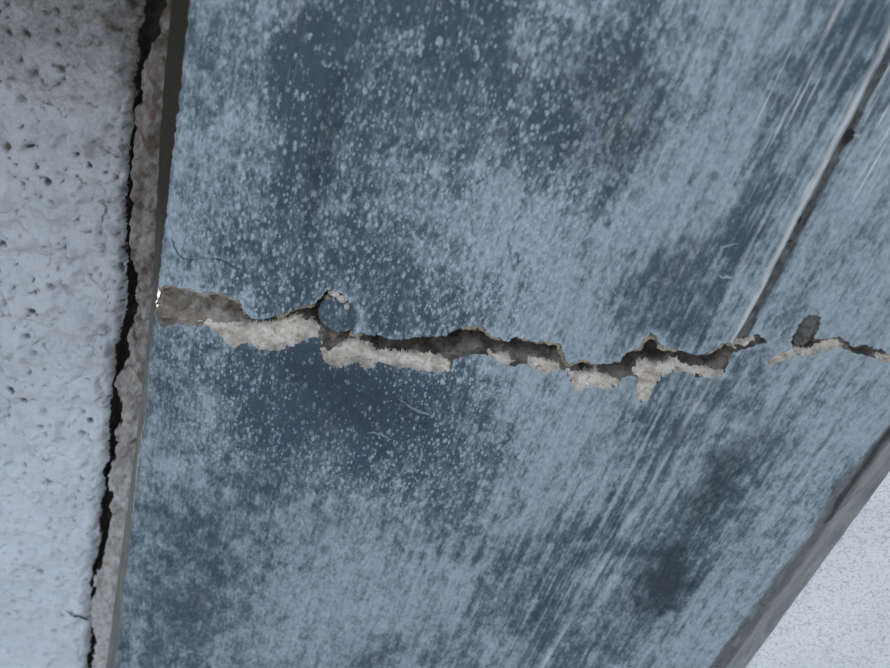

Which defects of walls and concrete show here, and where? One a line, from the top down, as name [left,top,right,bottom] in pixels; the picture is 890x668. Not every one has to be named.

crack [89,0,167,601]
crack [155,240,890,403]
crack [67,611,97,668]